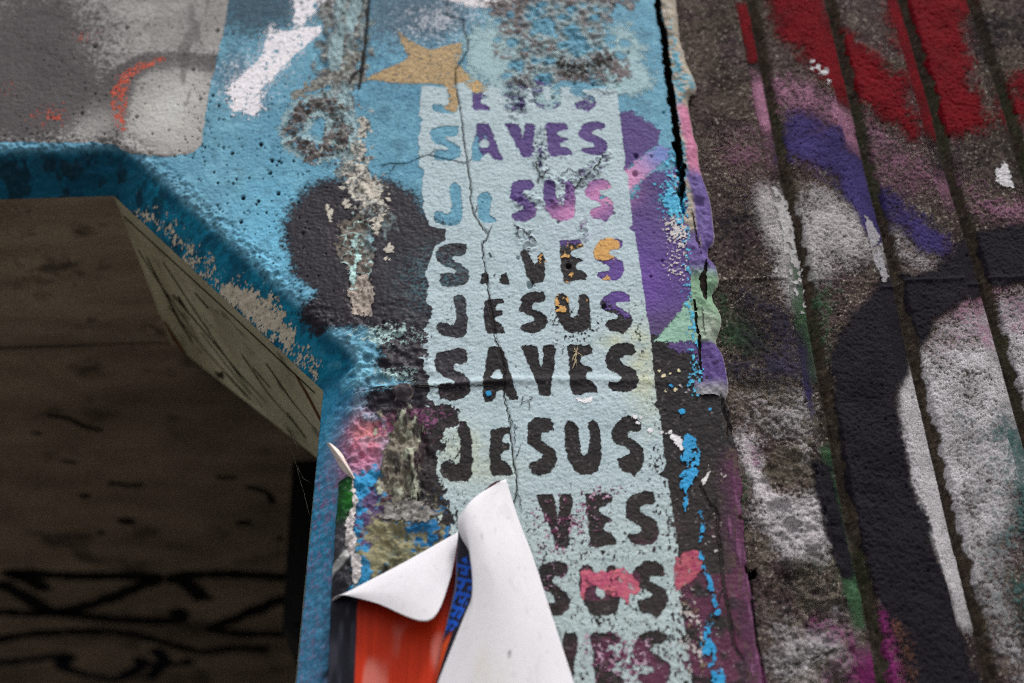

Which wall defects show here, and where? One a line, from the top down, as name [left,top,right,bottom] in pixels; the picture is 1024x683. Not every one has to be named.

peeling [136,206,323,382]
peeling [325,177,395,317]
crack [353,0,538,509]
crack [654,0,708,370]